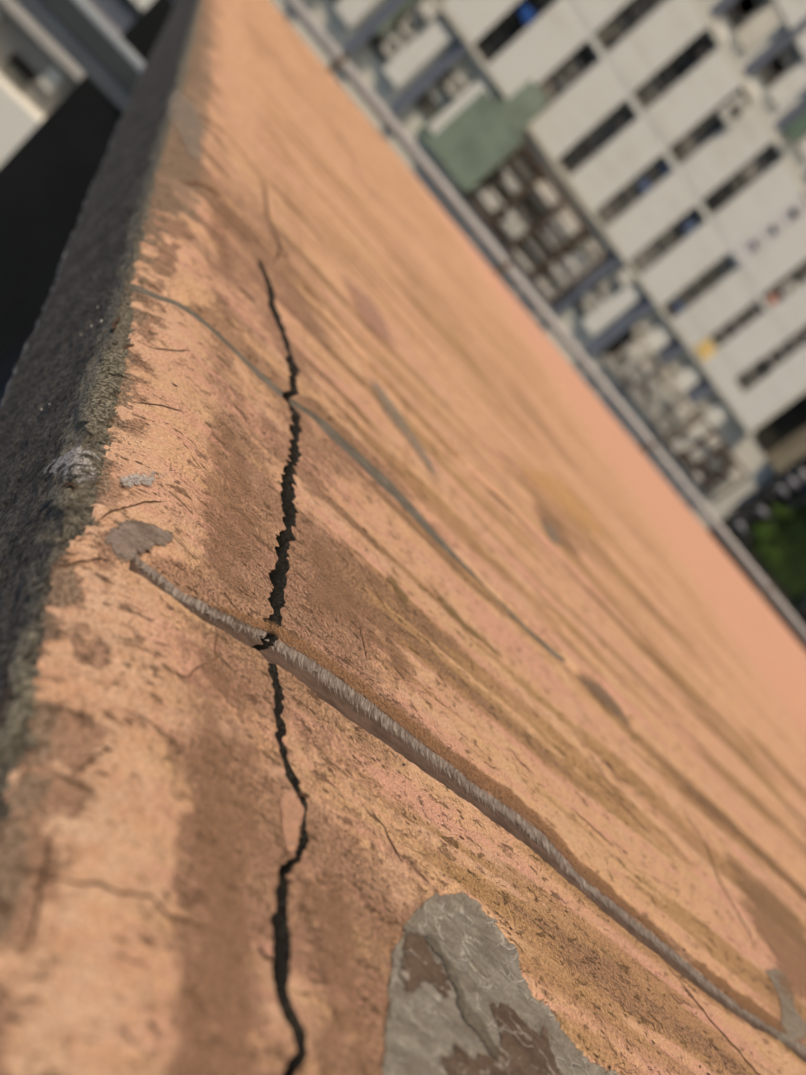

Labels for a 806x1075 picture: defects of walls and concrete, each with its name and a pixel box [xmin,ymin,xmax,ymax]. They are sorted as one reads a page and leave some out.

crack [118,631,220,677]
crack [191,112,342,1075]
spalling [382,891,619,1075]